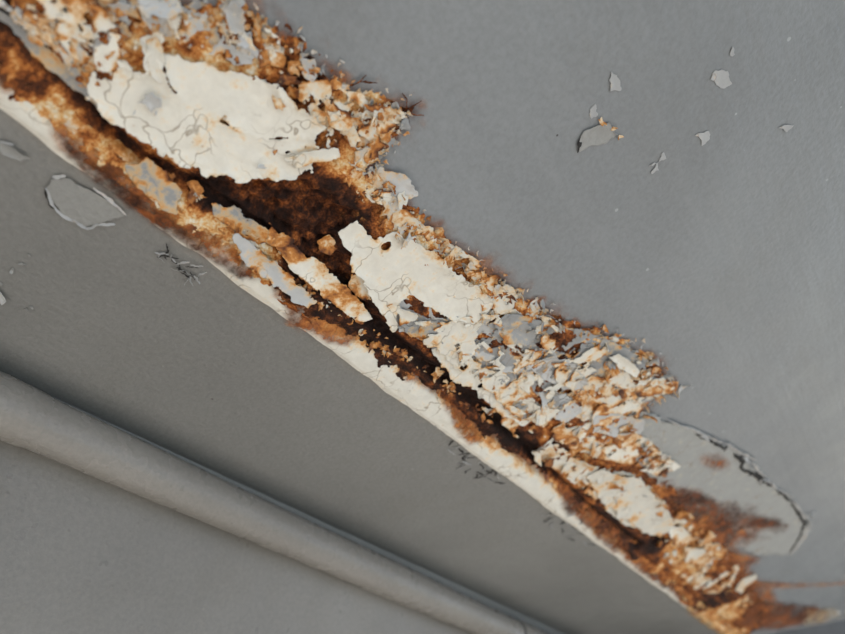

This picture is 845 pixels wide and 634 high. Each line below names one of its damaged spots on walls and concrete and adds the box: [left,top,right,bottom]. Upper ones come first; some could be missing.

corrosion [0,0,57,16]
peeling [44,174,127,230]
corrosion [80,9,148,81]
corrosion [0,21,285,286]
peeling [0,0,340,184]
peeling [186,180,207,204]
corrosion [249,240,306,286]
corrosion [161,0,414,138]
corrosion [296,126,606,369]
peeling [274,37,812,594]
corrosion [274,286,828,634]